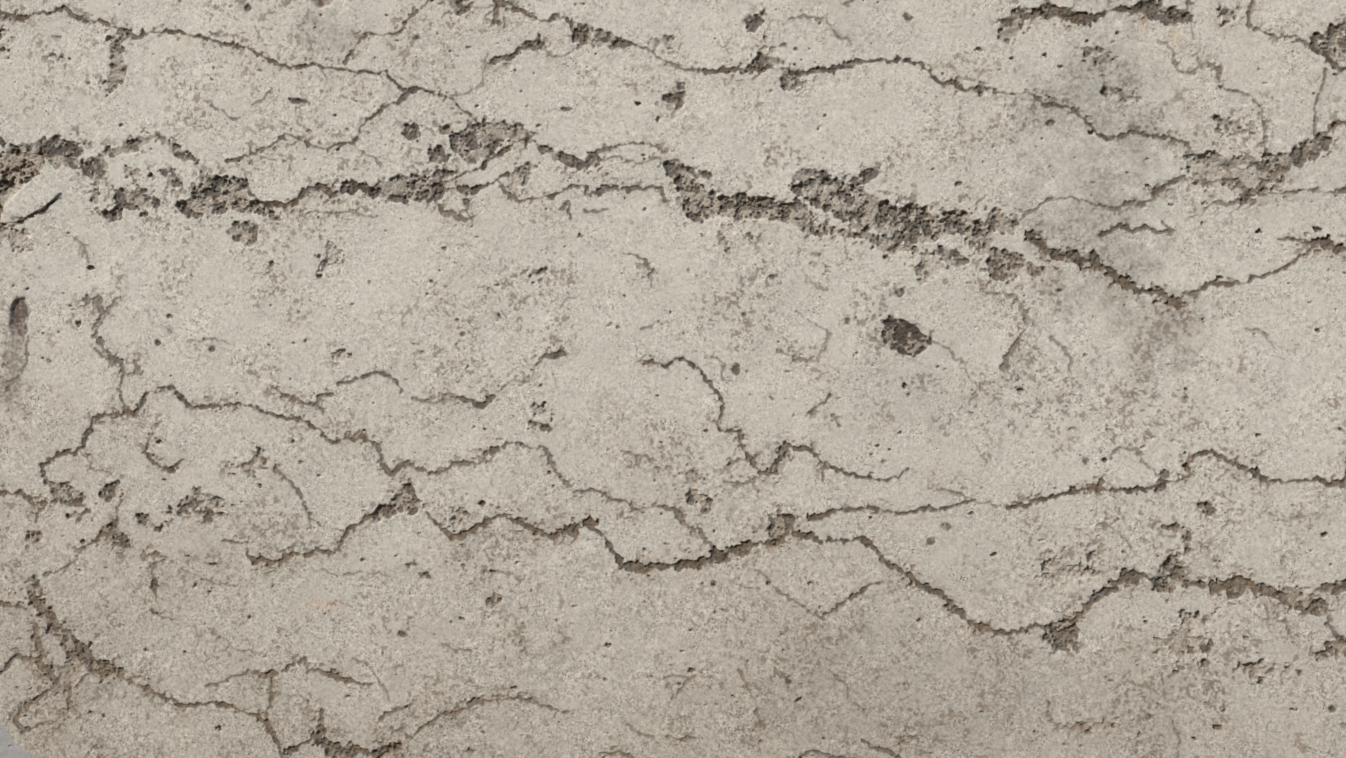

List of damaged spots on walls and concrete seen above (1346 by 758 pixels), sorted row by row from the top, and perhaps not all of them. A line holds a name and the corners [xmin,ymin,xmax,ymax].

spalling [0,122,277,266]
spalling [363,109,596,212]
spalling [556,100,580,118]
crack [0,0,1346,357]
spalling [655,148,1109,304]
spalling [0,284,57,418]
spalling [148,323,179,352]
crack [0,230,1346,758]